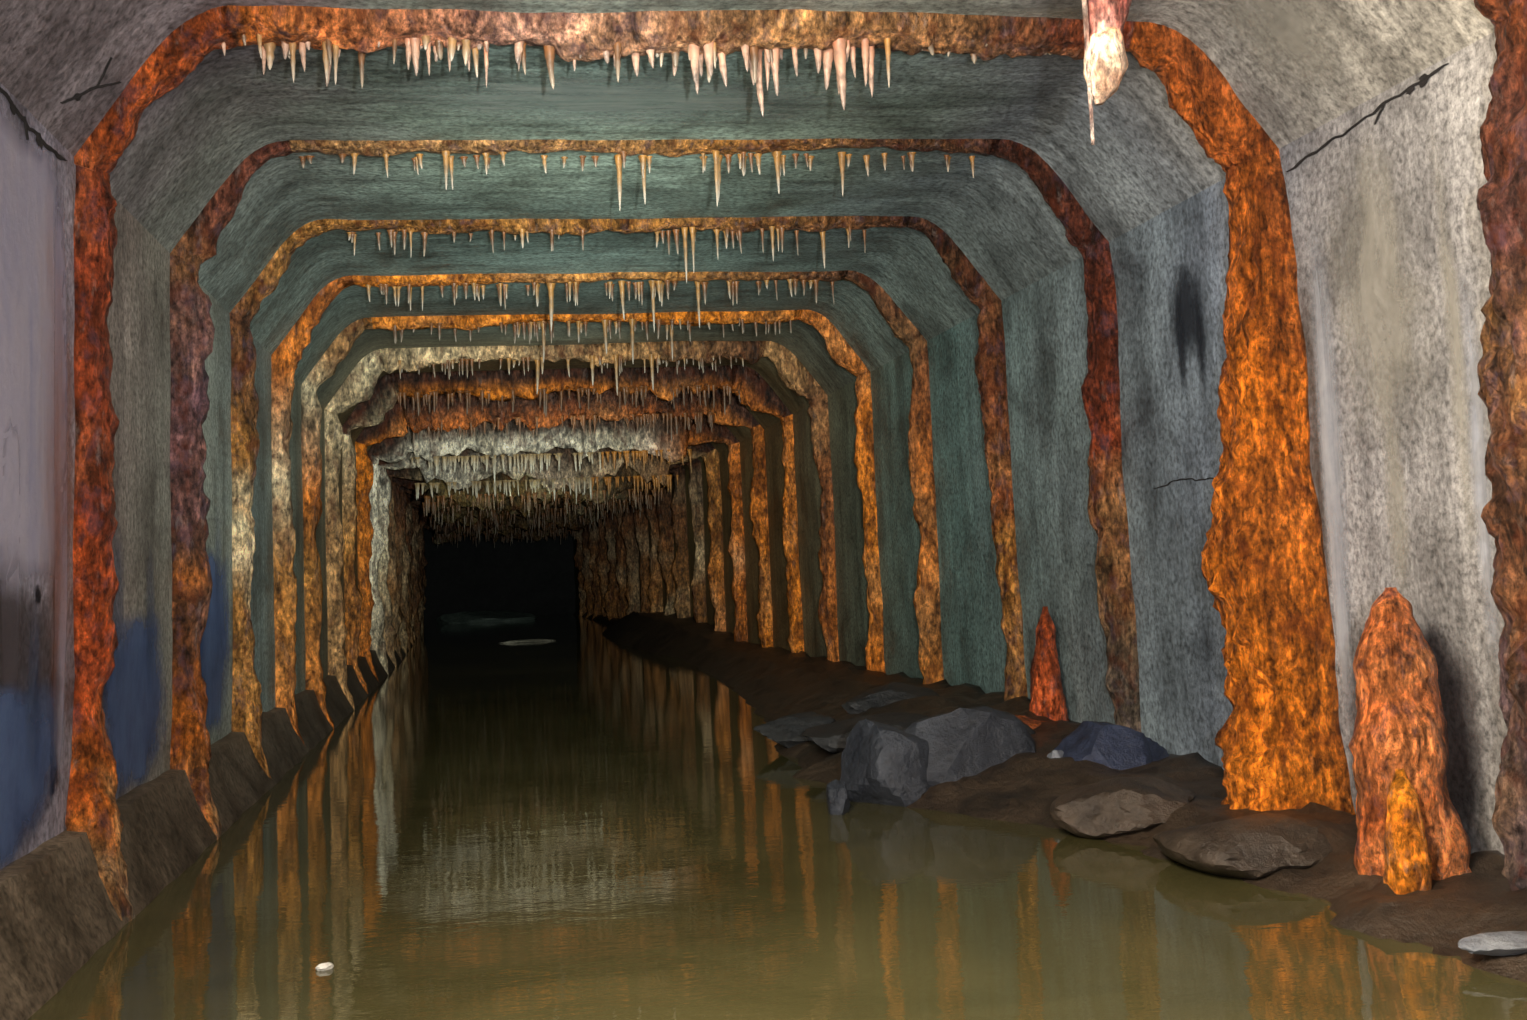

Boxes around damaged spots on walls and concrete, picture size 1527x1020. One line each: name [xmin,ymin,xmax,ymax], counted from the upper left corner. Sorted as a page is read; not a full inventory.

crack [0,87,67,161]
crack [60,57,121,104]
crack [1286,63,1449,172]
leakage [0,115,67,863]
corrosion [65,5,1141,922]
corrosion [1122,21,1356,815]
corrosion [1474,0,1527,891]
leakage [103,620,162,784]
leakage [200,556,229,726]